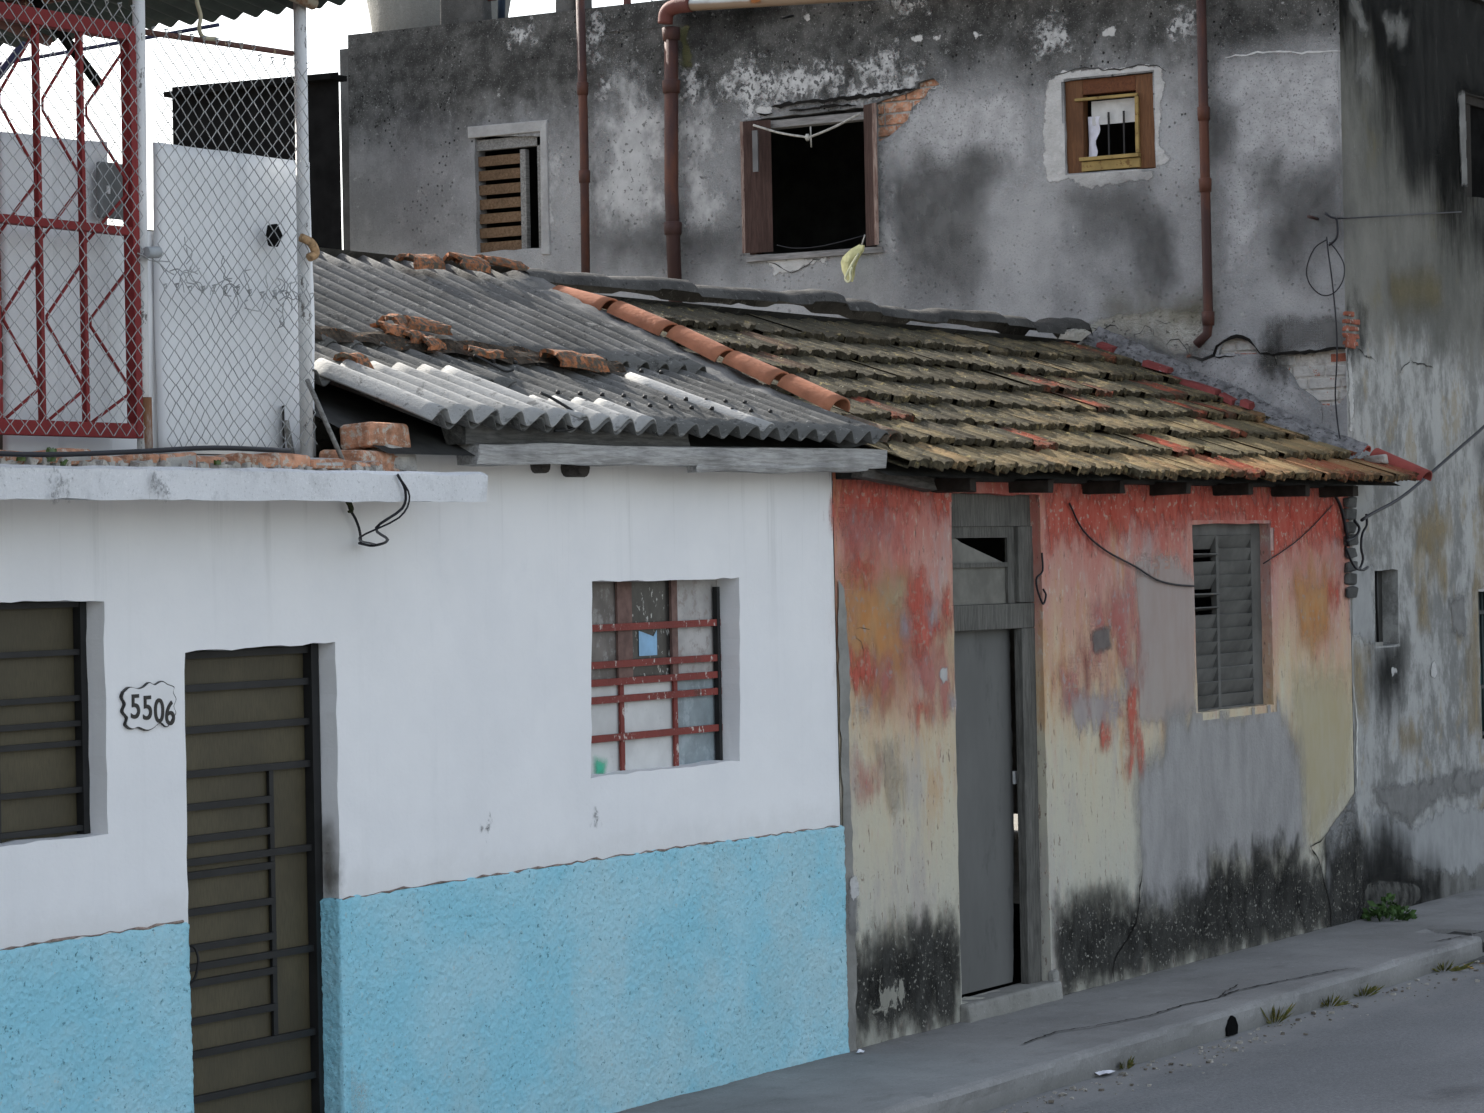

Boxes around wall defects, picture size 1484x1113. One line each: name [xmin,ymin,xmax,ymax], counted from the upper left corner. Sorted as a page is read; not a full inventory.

peeling [755,106,772,115]
flaking render [878,79,1041,179]
damp [1361,0,1484,184]
damp [893,158,981,282]
crack [1085,320,1433,373]
peeling [830,480,957,714]
damp [846,912,961,1039]
damp [1055,848,1331,995]